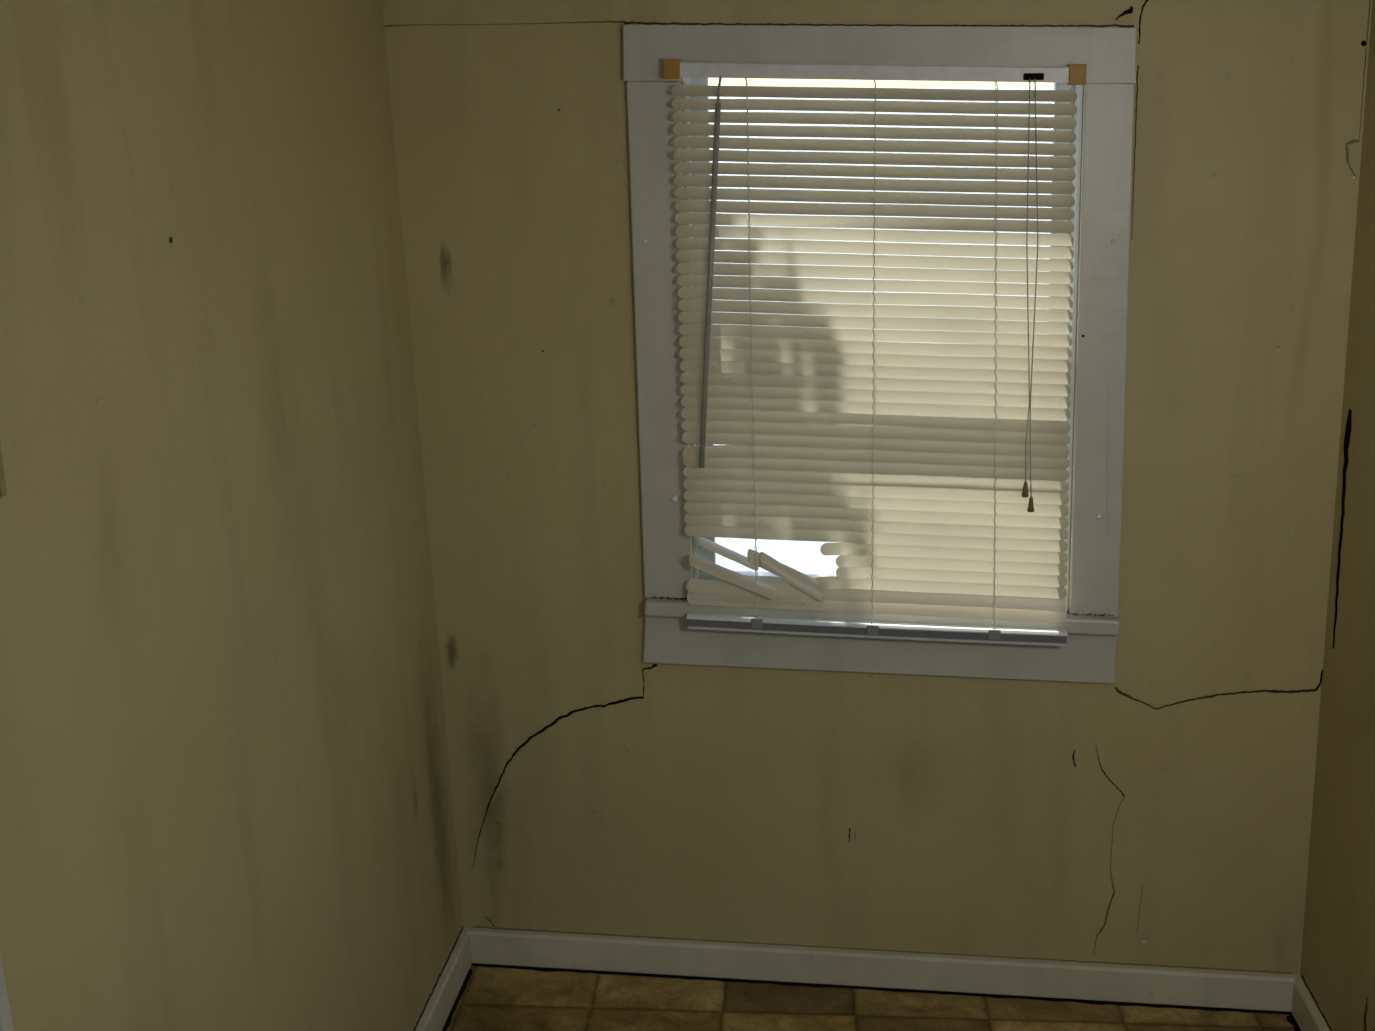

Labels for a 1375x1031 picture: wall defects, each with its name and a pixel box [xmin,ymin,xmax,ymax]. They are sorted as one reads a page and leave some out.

crack [1115,0,1149,44]
crack [1114,409,1352,710]
crack [473,664,658,866]
crack [1094,746,1143,953]